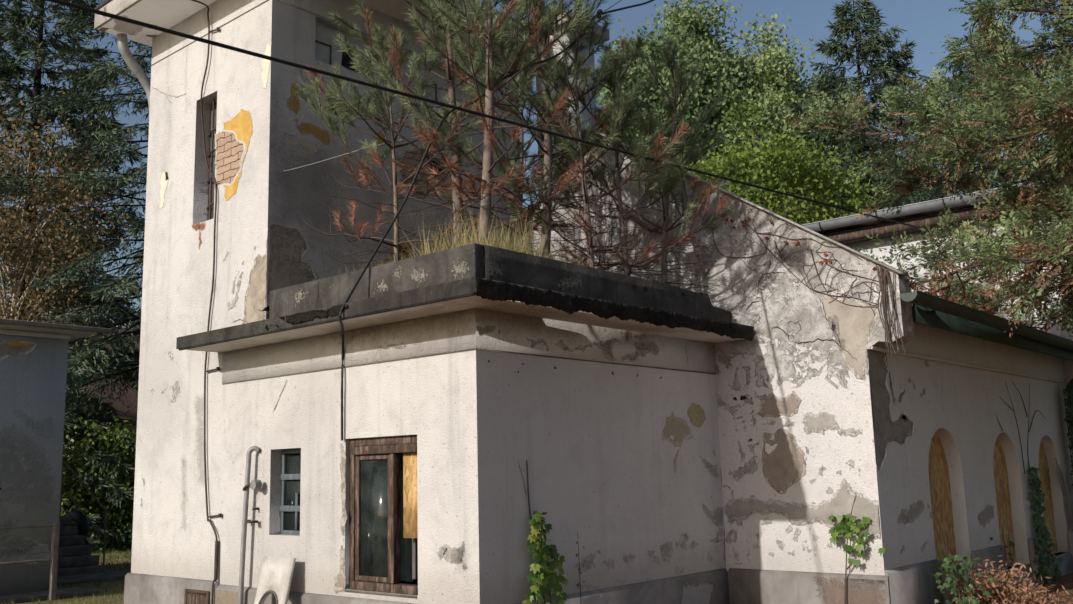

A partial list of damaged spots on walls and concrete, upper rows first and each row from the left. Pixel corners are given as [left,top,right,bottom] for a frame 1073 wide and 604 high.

peeling [287,83,330,145]
flaking render [215,109,253,201]
spalling [227,222,318,331]
flaking render [527,332,664,361]
spalling [700,267,926,497]
flaking render [660,400,706,472]
flaking render [438,542,467,570]